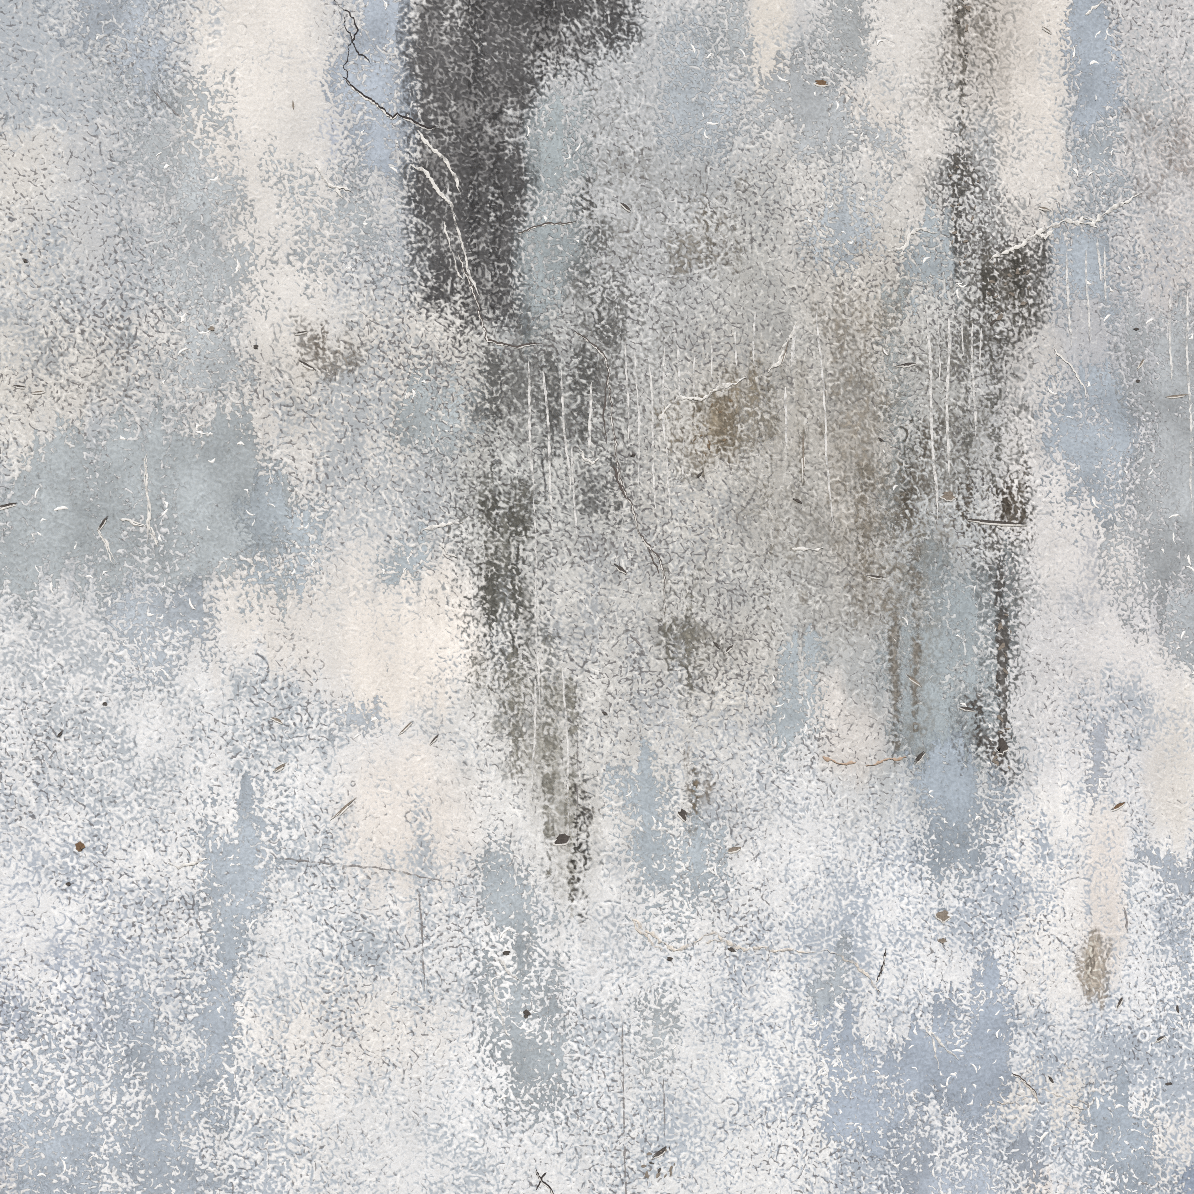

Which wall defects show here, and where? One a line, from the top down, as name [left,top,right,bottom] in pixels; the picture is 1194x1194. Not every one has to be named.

crack [315,166,350,197]
crack [333,0,542,349]
leakage [397,0,805,917]
leakage [816,0,1050,779]
crack [990,192,1142,260]